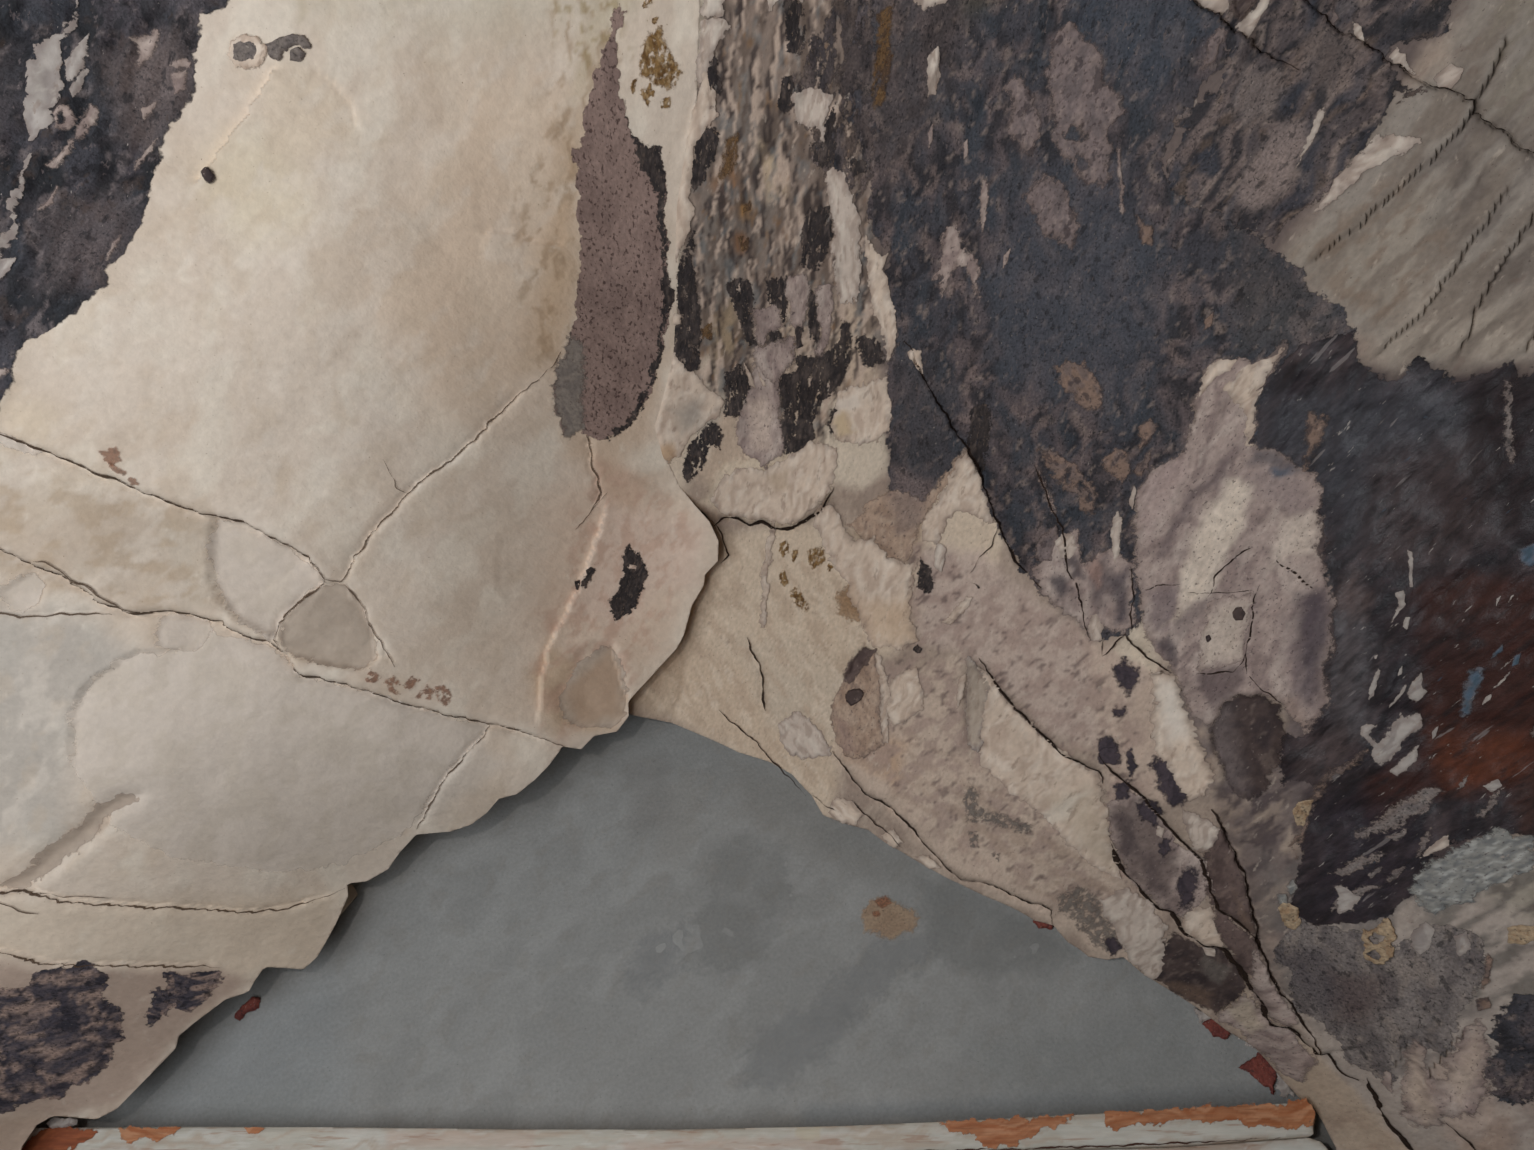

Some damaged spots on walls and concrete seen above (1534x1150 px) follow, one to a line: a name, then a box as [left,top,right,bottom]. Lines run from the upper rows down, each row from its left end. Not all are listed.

water stain [673,230,702,372]
crack [0,352,565,828]
crack [904,341,1312,705]
water stain [1112,656,1140,718]
crack [0,888,345,914]
spalling [956,656,1224,980]
water stain [1097,736,1261,1015]
crack [957,659,1413,1150]
water stain [1408,827,1534,915]
peeling [118,1125,181,1144]
peeling [940,1114,1077,1149]
spalling [1104,950,1318,1132]